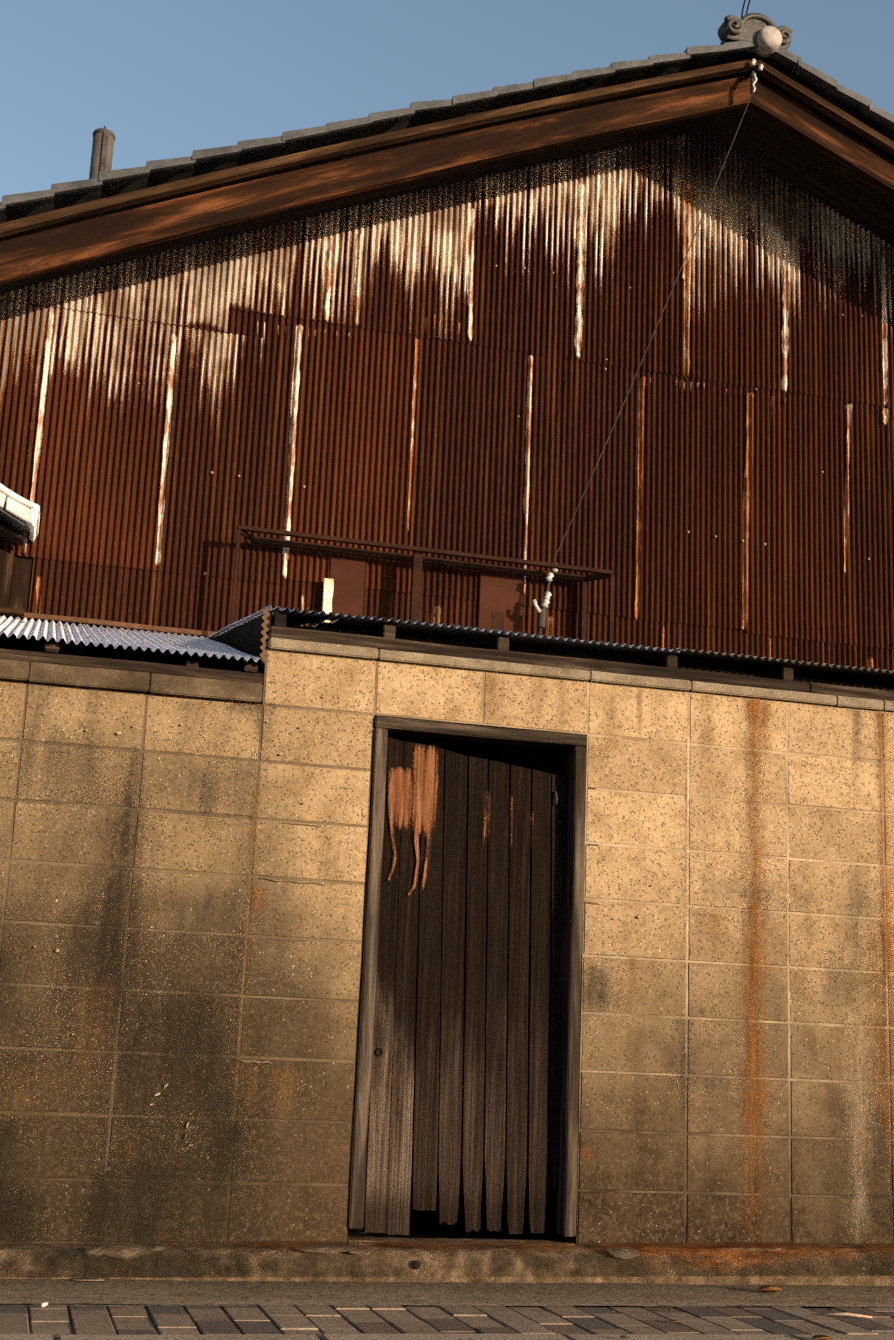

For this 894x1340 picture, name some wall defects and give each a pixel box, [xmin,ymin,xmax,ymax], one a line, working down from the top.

peeling [388,786,433,896]
rust [356,1241,894,1263]